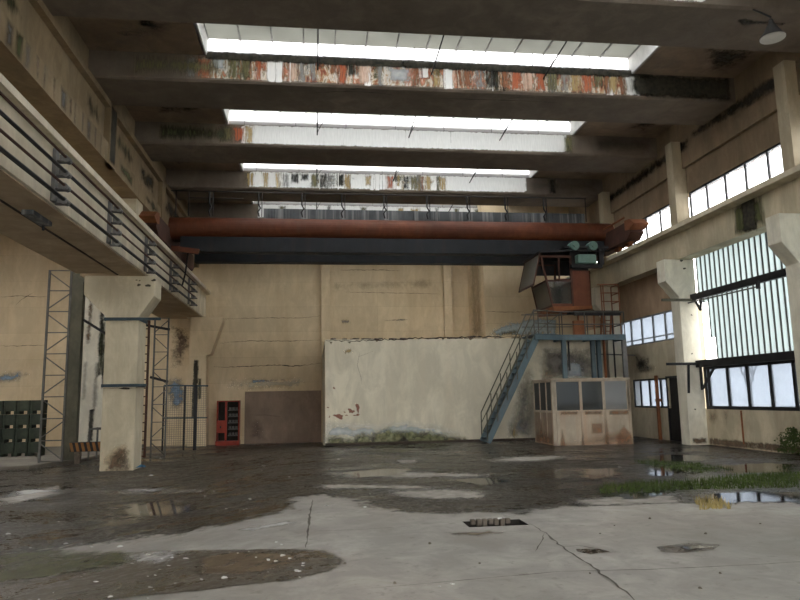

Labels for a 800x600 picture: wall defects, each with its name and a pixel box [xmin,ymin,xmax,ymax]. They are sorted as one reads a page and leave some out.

water stain [135,48,775,152]
water stain [610,156,666,200]
water stain [741,198,757,233]
crack [305,500,313,547]
water stain [0,427,800,600]
crack [531,524,634,600]